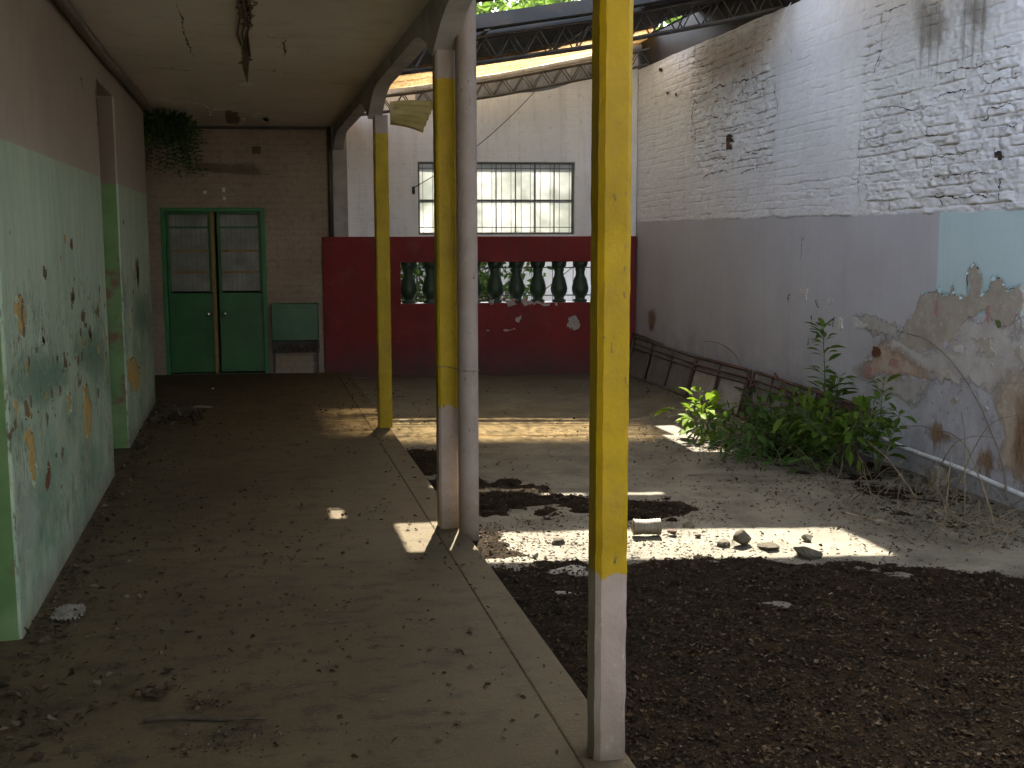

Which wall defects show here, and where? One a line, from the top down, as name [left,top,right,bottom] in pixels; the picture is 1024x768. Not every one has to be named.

crack [689,57,778,179]
crack [848,45,1020,205]
peeling [9,277,107,490]
peeling [478,297,557,332]
peeling [567,315,580,330]
peeling [856,261,1024,484]